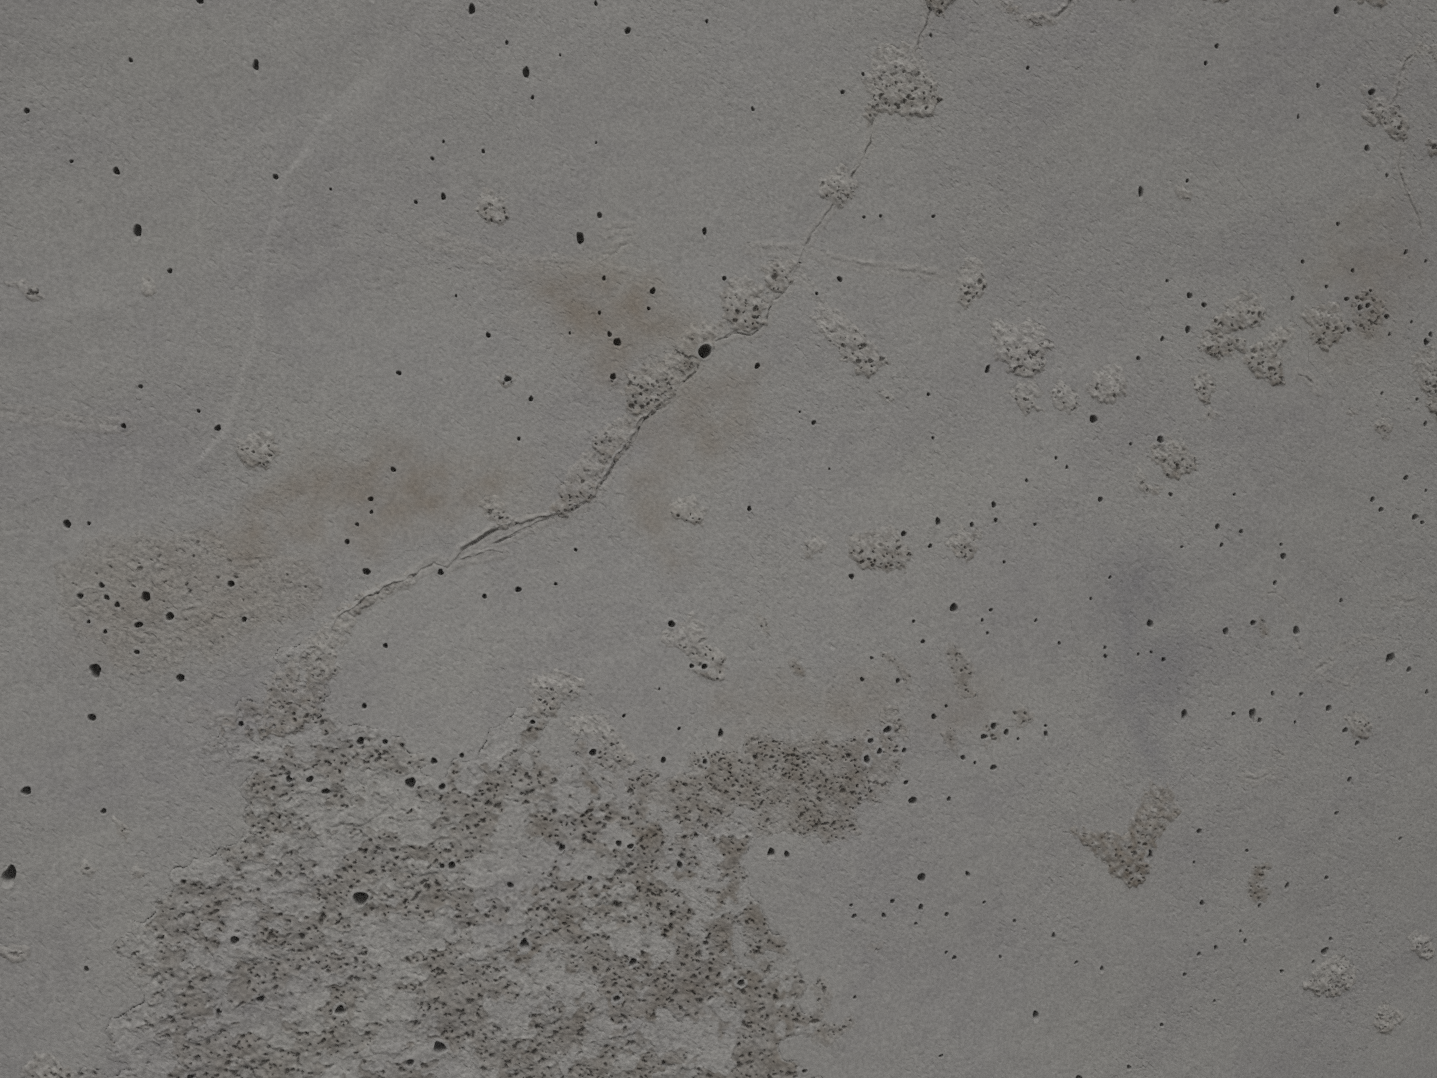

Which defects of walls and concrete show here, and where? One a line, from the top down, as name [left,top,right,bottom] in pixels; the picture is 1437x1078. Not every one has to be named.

spalling [859,41,944,128]
crack [904,0,957,73]
crack [991,0,1080,29]
crack [1203,0,1237,8]
crack [1349,0,1393,8]
spalling [989,316,1128,417]
spalling [1190,287,1385,405]
crack [257,105,882,741]
spalling [52,529,323,675]
spalling [659,611,728,681]
spalling [19,644,910,1078]
spalling [1070,777,1183,893]